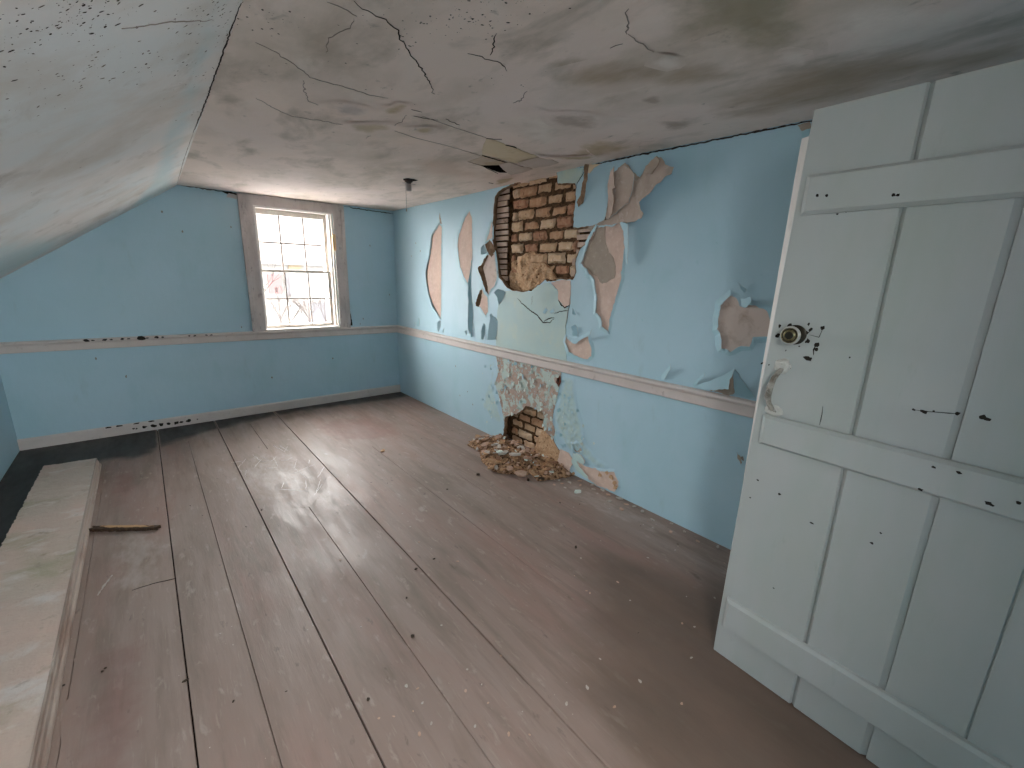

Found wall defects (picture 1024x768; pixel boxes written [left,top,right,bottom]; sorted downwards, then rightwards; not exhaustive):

crack [121,3,242,193]
crack [255,42,384,125]
crack [326,1,486,156]
crack [471,33,507,71]
crack [611,8,653,52]
crack [580,120,812,168]
flaking render [427,225,444,332]
flaking render [458,164,627,494]
flaking render [717,282,792,352]
peeling [106,419,198,429]